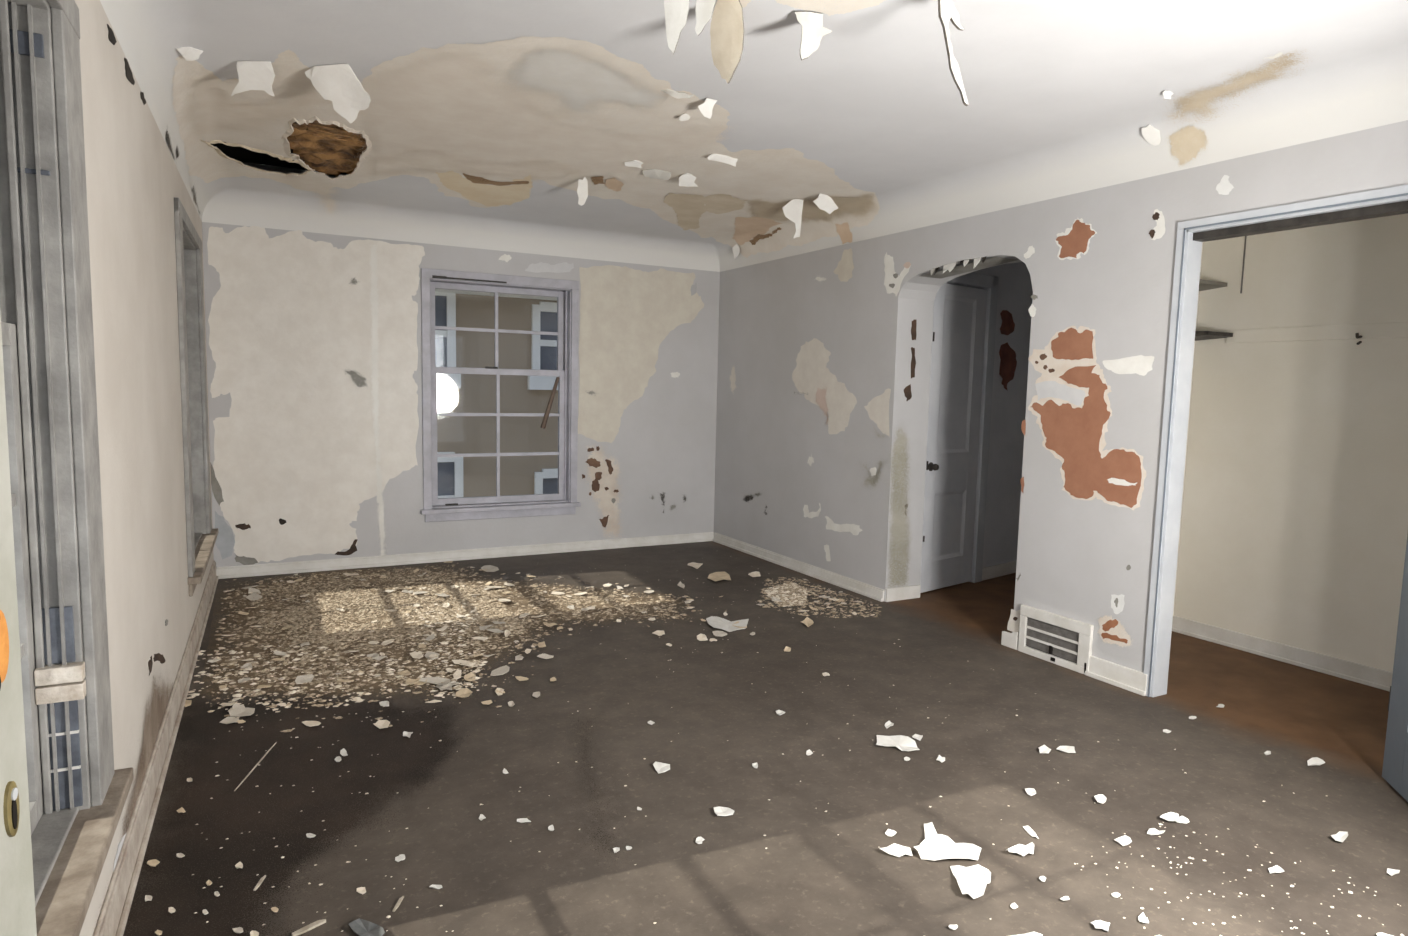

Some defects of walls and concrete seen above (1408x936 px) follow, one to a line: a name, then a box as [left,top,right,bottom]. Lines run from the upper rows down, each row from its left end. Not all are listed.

peeling [172,36,882,282]
peeling [664,0,884,84]
peeling [933,0,968,106]
damp [1141,49,1312,167]
spalling [1055,218,1097,260]
peeling [207,226,425,565]
peeling [525,262,704,539]
peeling [792,320,917,440]
spalling [999,310,1146,511]